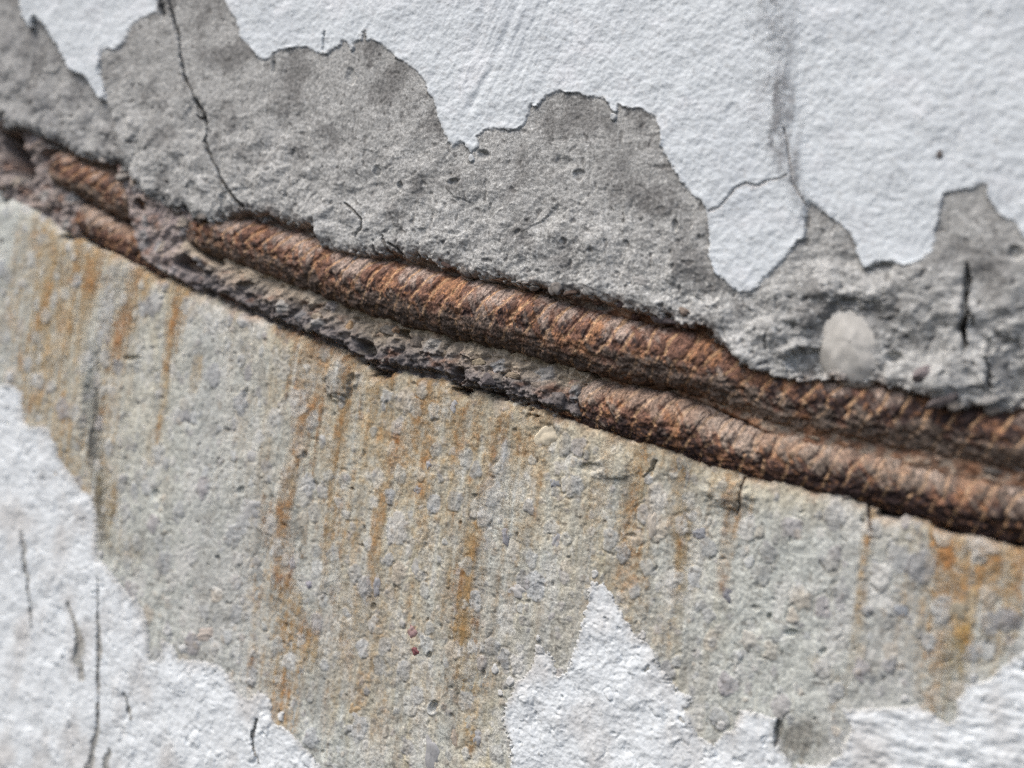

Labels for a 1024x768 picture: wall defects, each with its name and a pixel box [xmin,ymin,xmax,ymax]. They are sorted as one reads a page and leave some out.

crack [156,0,245,209]
crack [707,128,808,213]
rust [18,227,114,467]
rust [163,287,191,388]
peeling [0,0,1024,547]
crack [959,264,995,391]
rust [272,662,299,727]